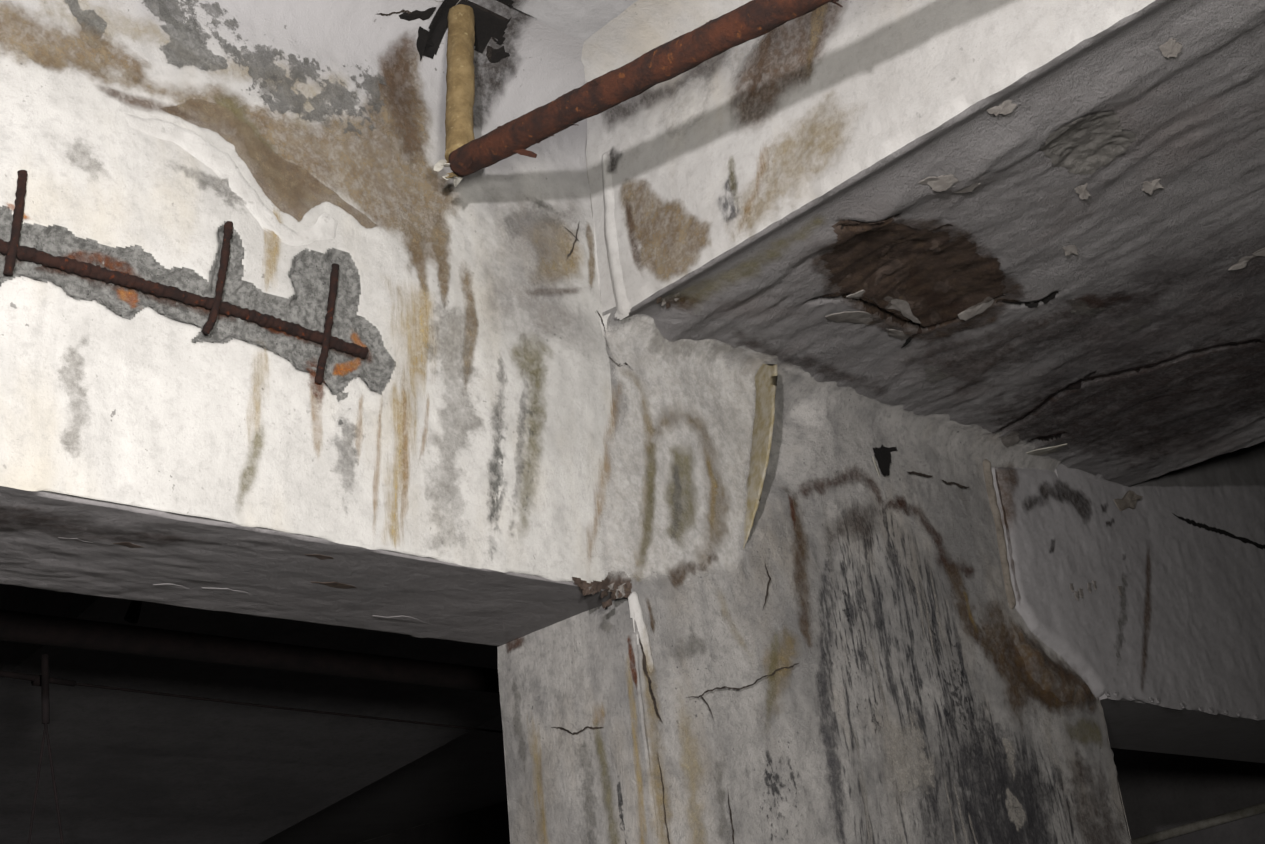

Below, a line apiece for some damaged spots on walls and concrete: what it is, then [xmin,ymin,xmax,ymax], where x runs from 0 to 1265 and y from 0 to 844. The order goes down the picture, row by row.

peeling [143,0,386,137]
damp [726,2,841,121]
corrosion [39,251,236,319]
spalling [0,113,396,395]
damp [0,5,454,385]
corrosion [333,334,371,376]
spalling [872,445,898,477]
spalling [572,571,632,609]
crack [1172,513,1265,550]
crack [639,638,670,844]
crack [691,663,799,717]
damp [769,470,1118,844]